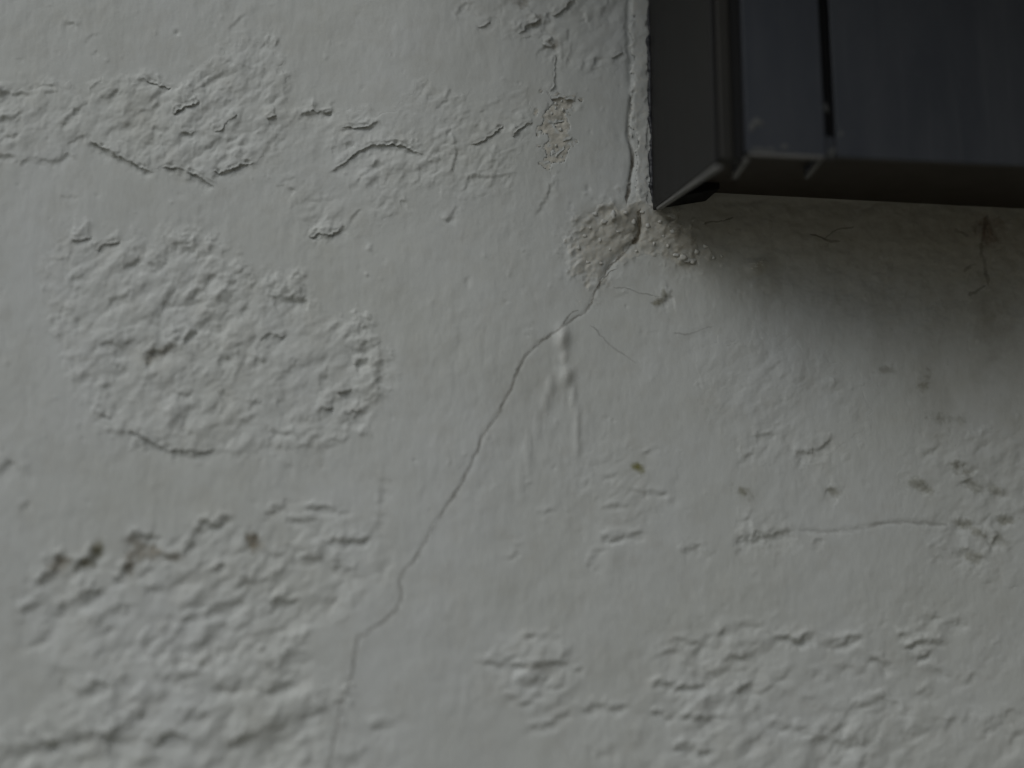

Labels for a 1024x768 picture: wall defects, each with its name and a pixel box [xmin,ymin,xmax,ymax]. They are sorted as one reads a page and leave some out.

peeling [0,0,632,243]
crack [617,156,641,260]
spalling [563,187,723,304]